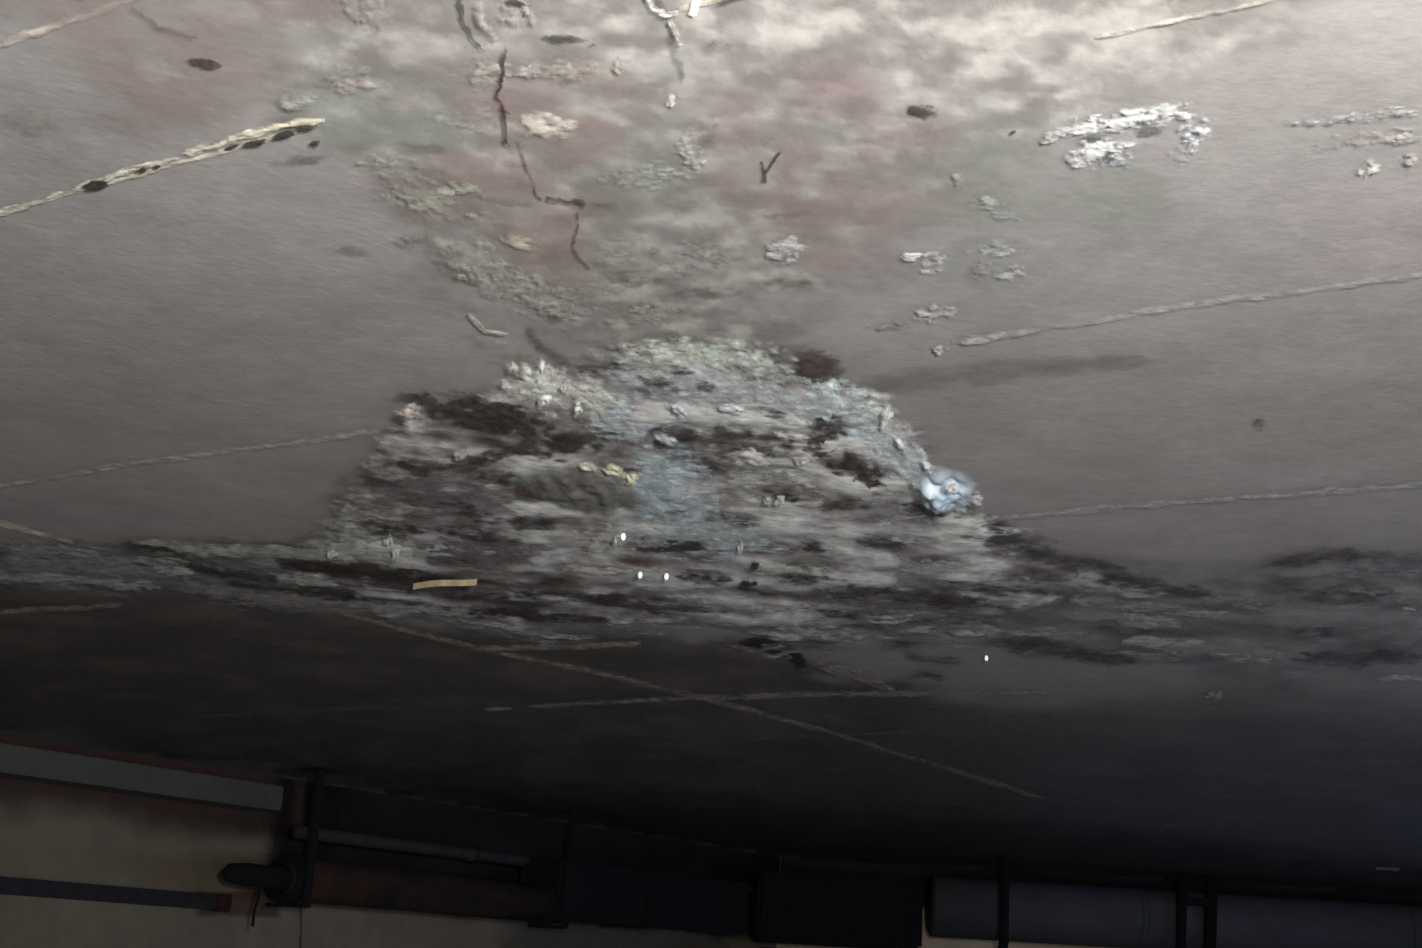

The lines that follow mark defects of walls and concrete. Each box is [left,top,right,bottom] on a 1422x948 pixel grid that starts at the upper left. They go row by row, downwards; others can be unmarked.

peeling [320,68,382,95]
peeling [357,142,522,218]
peeling [428,63,515,148]
crack [457,0,589,269]
damp [0,0,1246,367]
crack [646,0,700,108]
spalling [283,234,1083,695]
damp [928,506,1422,678]